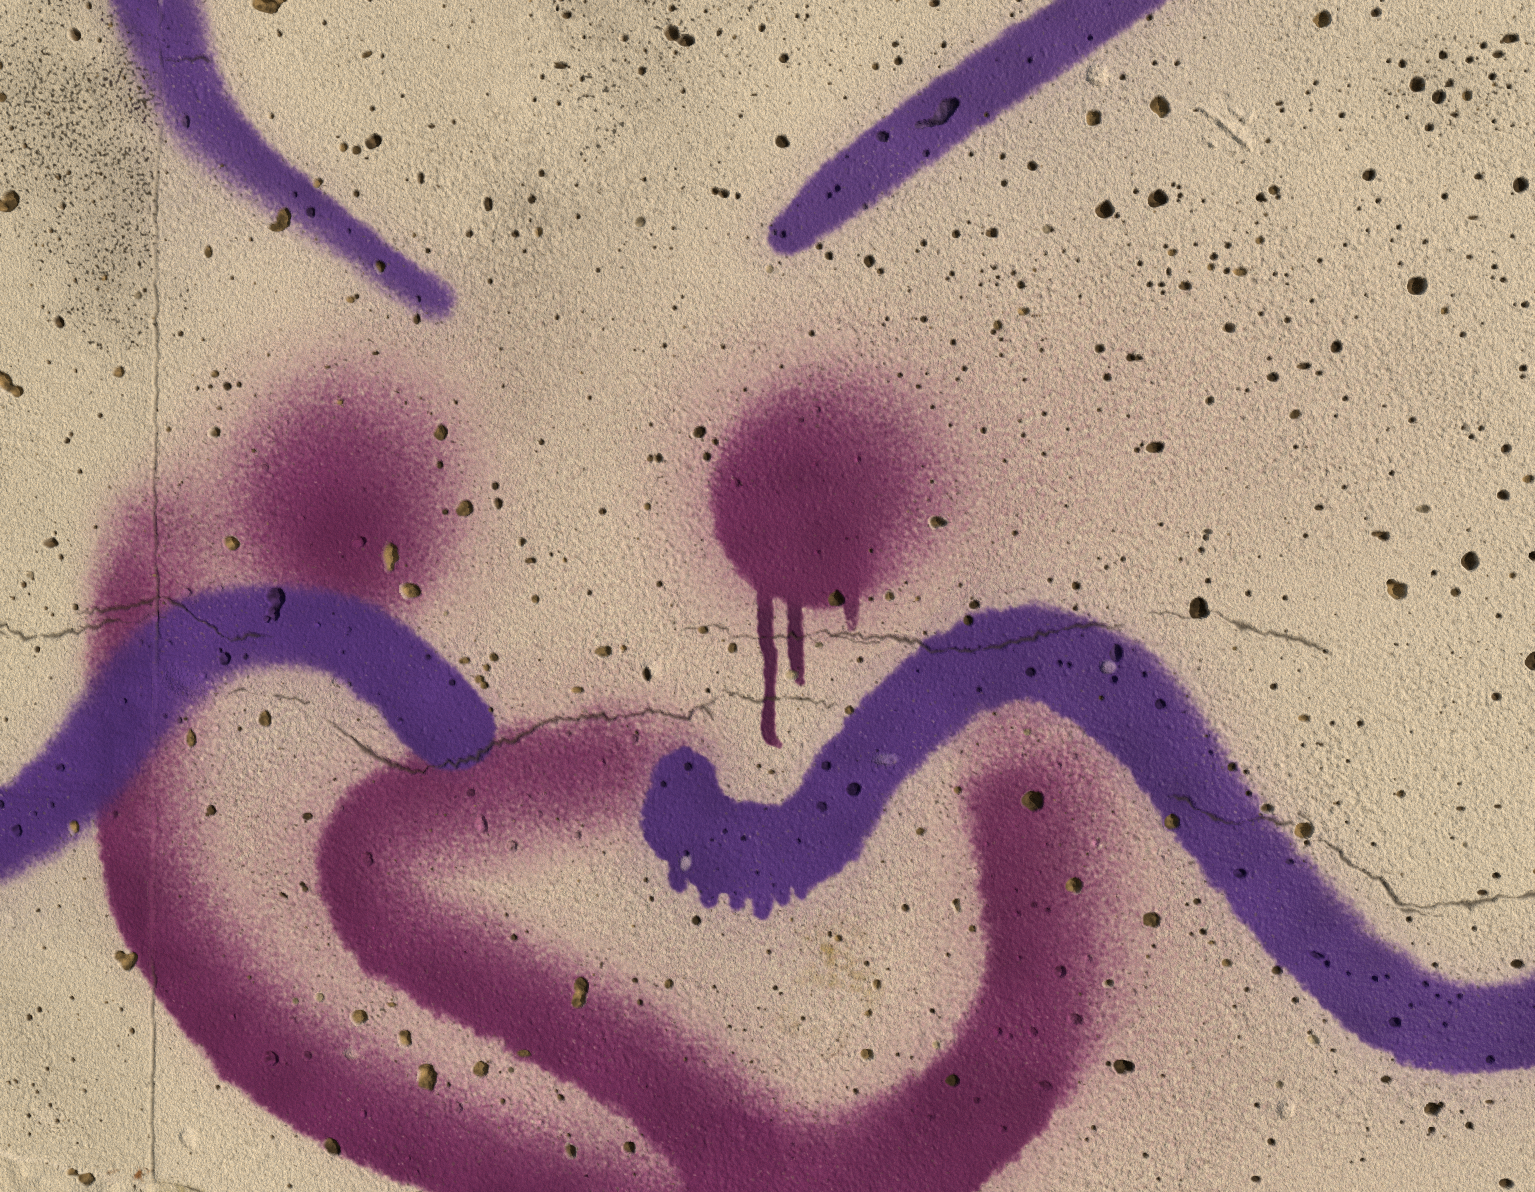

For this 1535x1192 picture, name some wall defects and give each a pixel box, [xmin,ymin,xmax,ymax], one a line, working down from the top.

crack [0,595,274,644]
crack [679,609,1332,657]
crack [224,685,838,777]
crack [1167,792,1535,919]